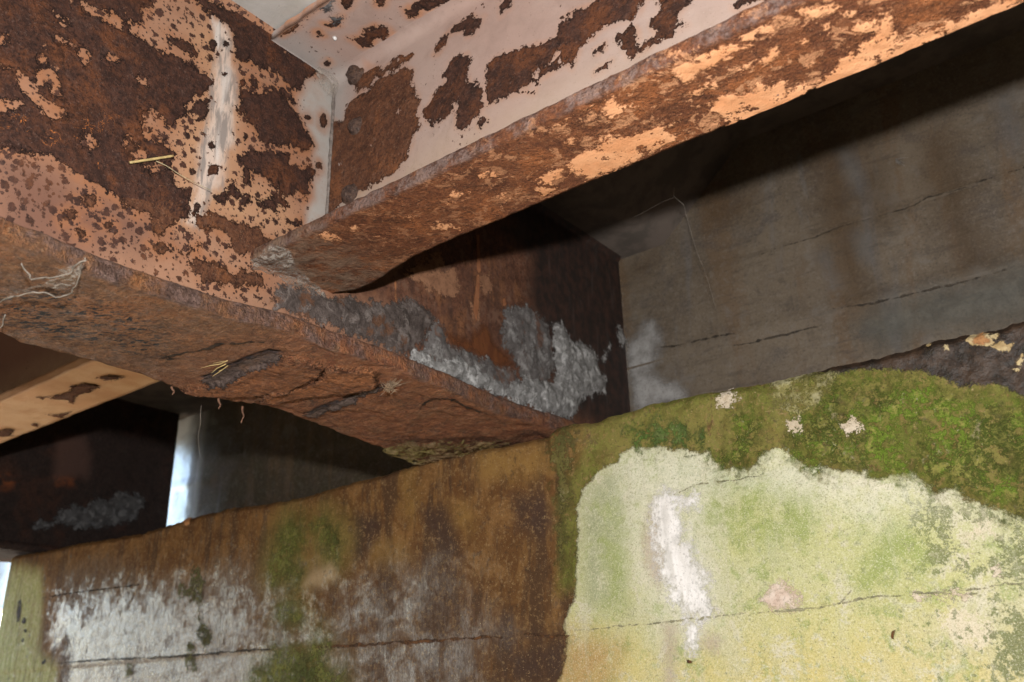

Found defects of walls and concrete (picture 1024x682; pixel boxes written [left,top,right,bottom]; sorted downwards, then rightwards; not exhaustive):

corrosion [730,0,765,12]
peeling [537,95,643,134]
corrosion [0,0,693,290]
peeling [534,122,680,200]
corrosion [449,234,509,367]
crack [847,277,978,307]
crack [660,327,817,348]
corrosion [37,374,126,418]
damp [0,302,1024,682]
crack [759,582,1022,613]
crack [595,614,733,629]